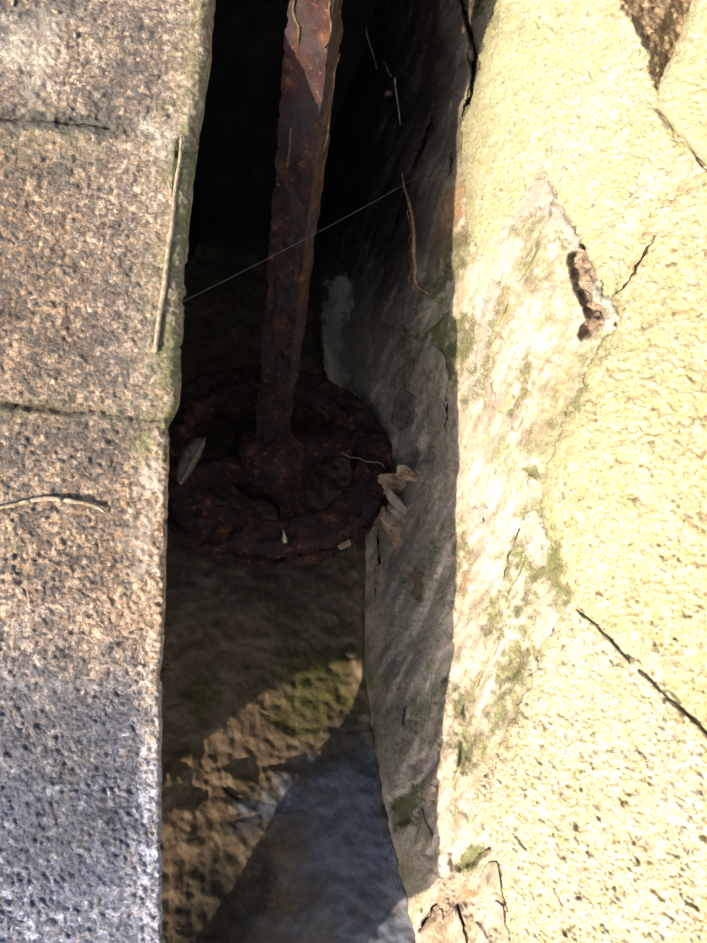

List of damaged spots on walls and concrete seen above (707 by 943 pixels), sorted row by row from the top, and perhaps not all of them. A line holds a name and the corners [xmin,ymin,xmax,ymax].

crack [0,118,108,130]
spalling [568,249,606,340]
crack [576,610,707,734]